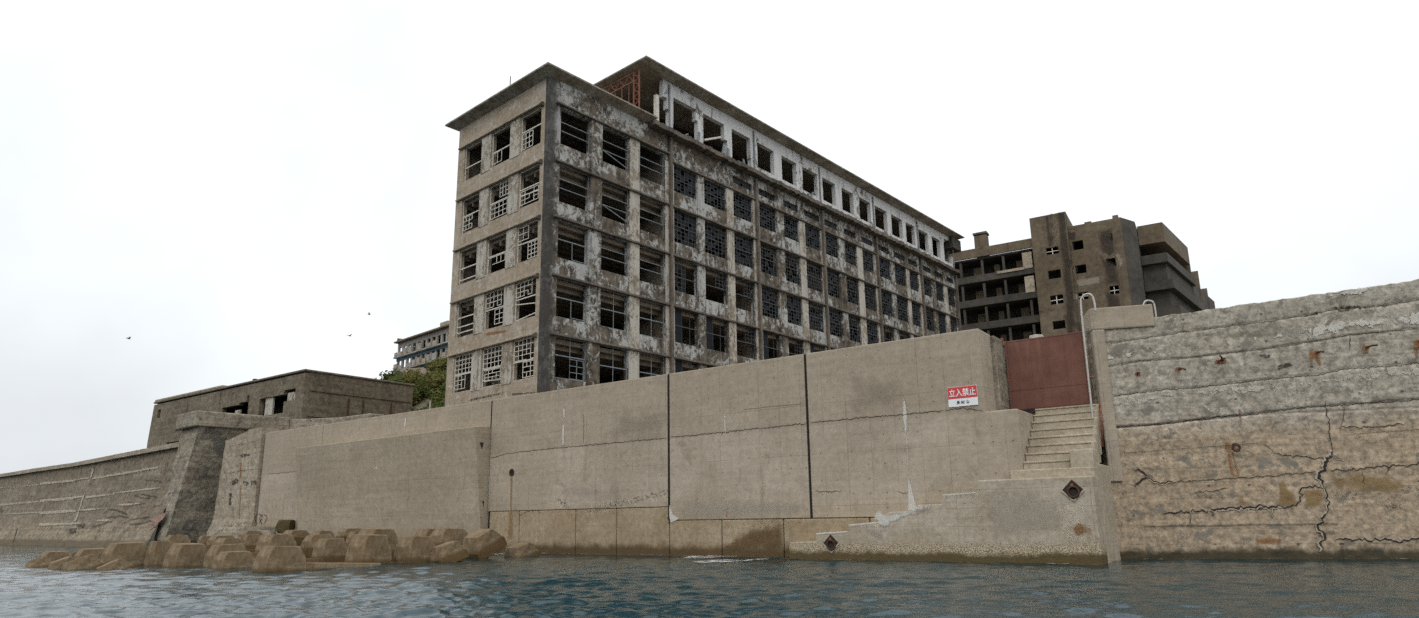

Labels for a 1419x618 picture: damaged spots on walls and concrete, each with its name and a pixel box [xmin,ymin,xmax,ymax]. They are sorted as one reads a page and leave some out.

damp [730,528,781,549]
crack [1110,299,1419,552]